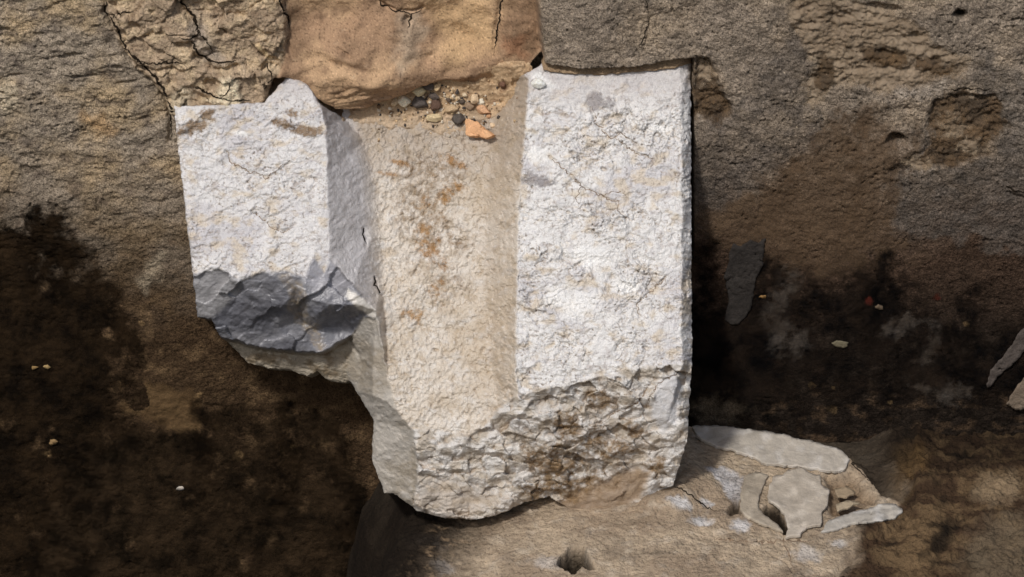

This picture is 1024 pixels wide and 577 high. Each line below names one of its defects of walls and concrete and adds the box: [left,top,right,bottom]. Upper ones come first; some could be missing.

crack [104,0,272,136]
leakage [0,206,368,577]
spalling [193,255,379,354]
leakage [688,240,1024,434]